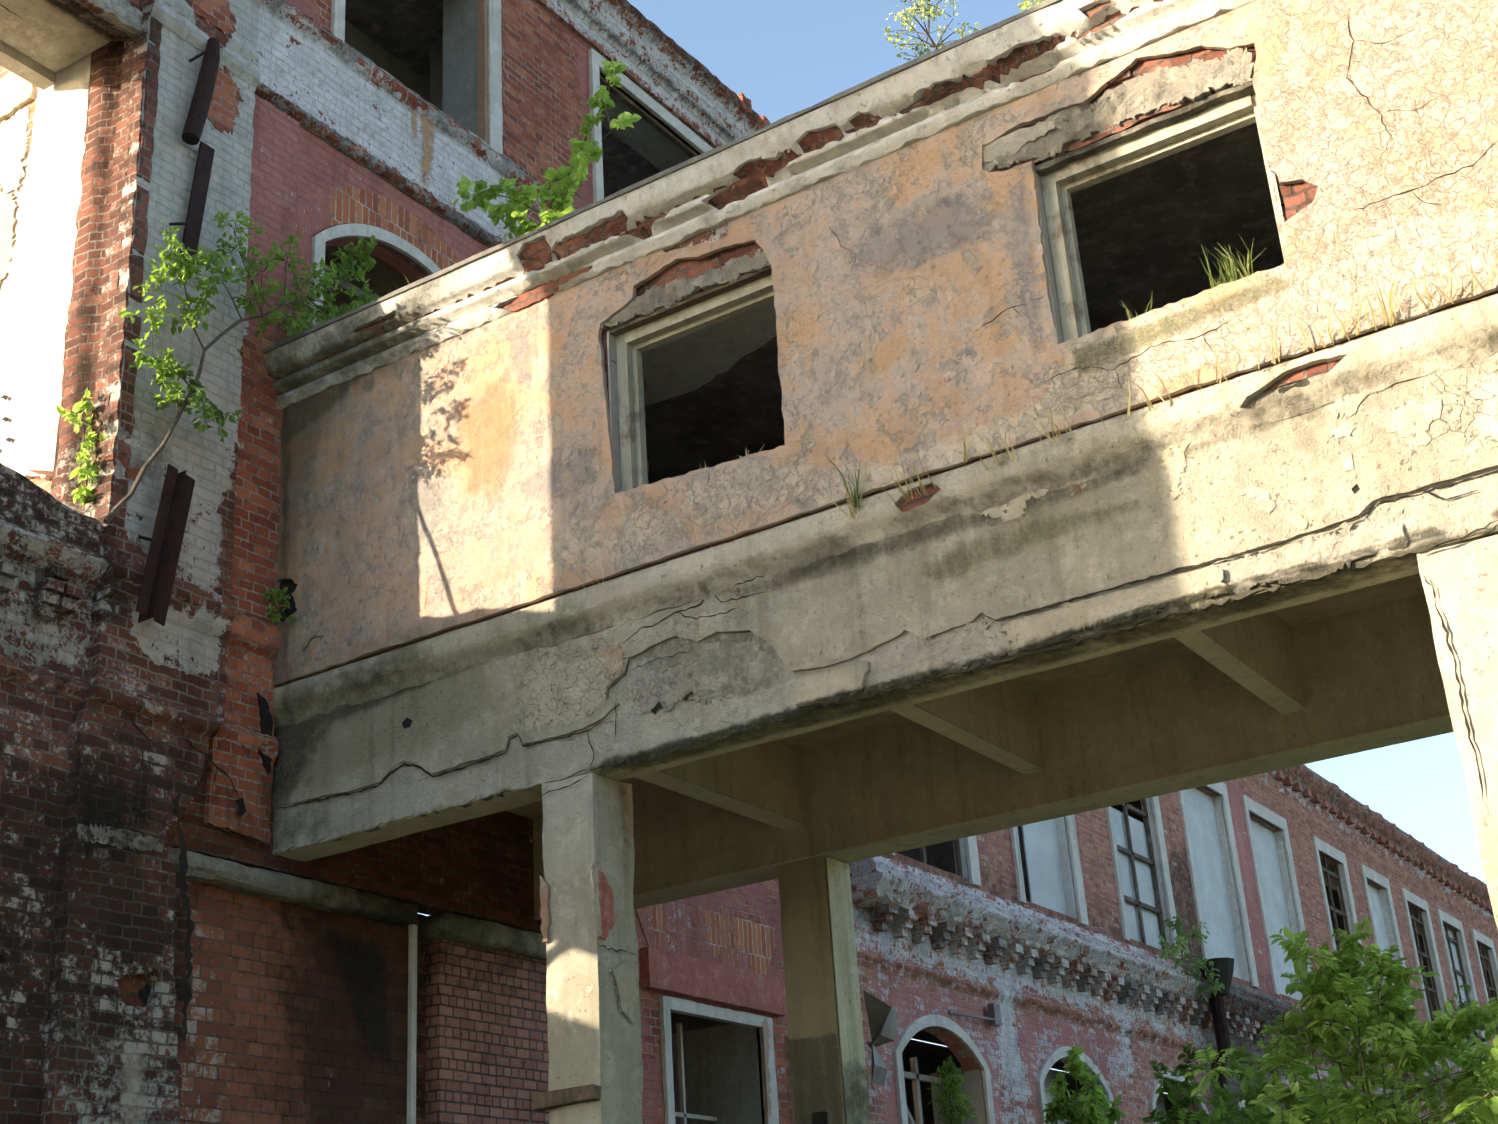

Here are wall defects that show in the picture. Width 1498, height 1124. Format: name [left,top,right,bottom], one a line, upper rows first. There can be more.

flaking render [665,1,1127,252]
spalling [983,47,1256,178]
crack [1343,4,1438,159]
crack [1350,142,1495,213]
flaking render [0,72,52,481]
flaking render [499,213,666,312]
spalling [601,249,772,337]
peeling [1468,373,1498,441]
spalling [520,484,1409,733]
crack [984,466,1498,815]